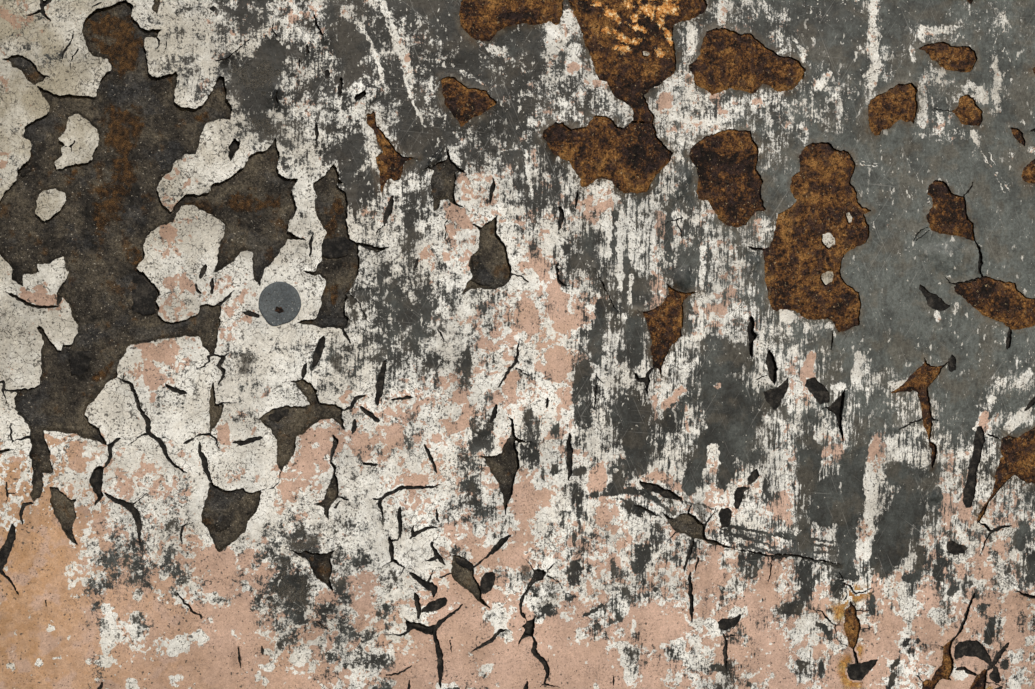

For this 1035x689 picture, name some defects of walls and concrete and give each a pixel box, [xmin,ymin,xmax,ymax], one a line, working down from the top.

corrosion [459,0,806,194]
peeling [0,0,306,552]
peeling [298,165,389,329]
corrosion [638,281,698,376]
corrosion [689,129,766,228]
corrosion [762,142,871,332]
peeling [256,379,345,520]
crack [566,433,574,481]
crack [0,482,34,595]
crack [332,444,576,689]
crack [634,480,717,622]
spalling [951,640,1003,689]